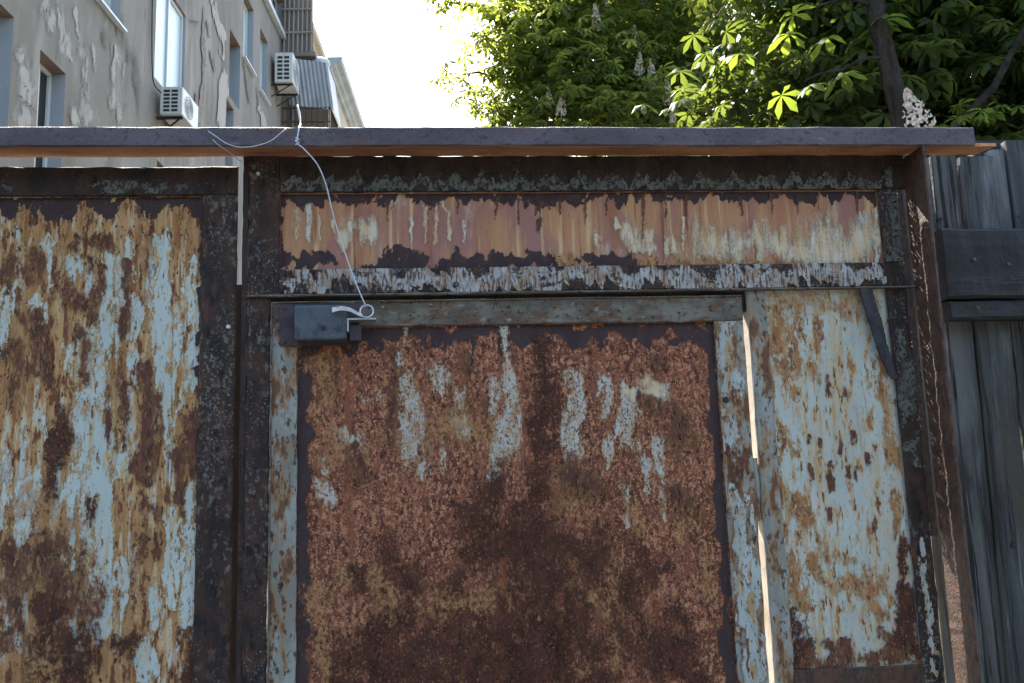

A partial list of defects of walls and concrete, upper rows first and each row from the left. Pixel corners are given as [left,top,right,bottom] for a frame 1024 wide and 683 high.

peeling [40,0,96,127]
peeling [195,0,229,127]
rust [281,191,876,270]
peeling [279,166,904,294]
peeling [0,225,201,683]
rust [0,196,203,683]
peeling [313,454,338,509]
peeling [395,327,471,481]
peeling [483,326,523,489]
rust [296,322,752,683]
peeling [558,367,670,529]
rust [766,303,920,670]